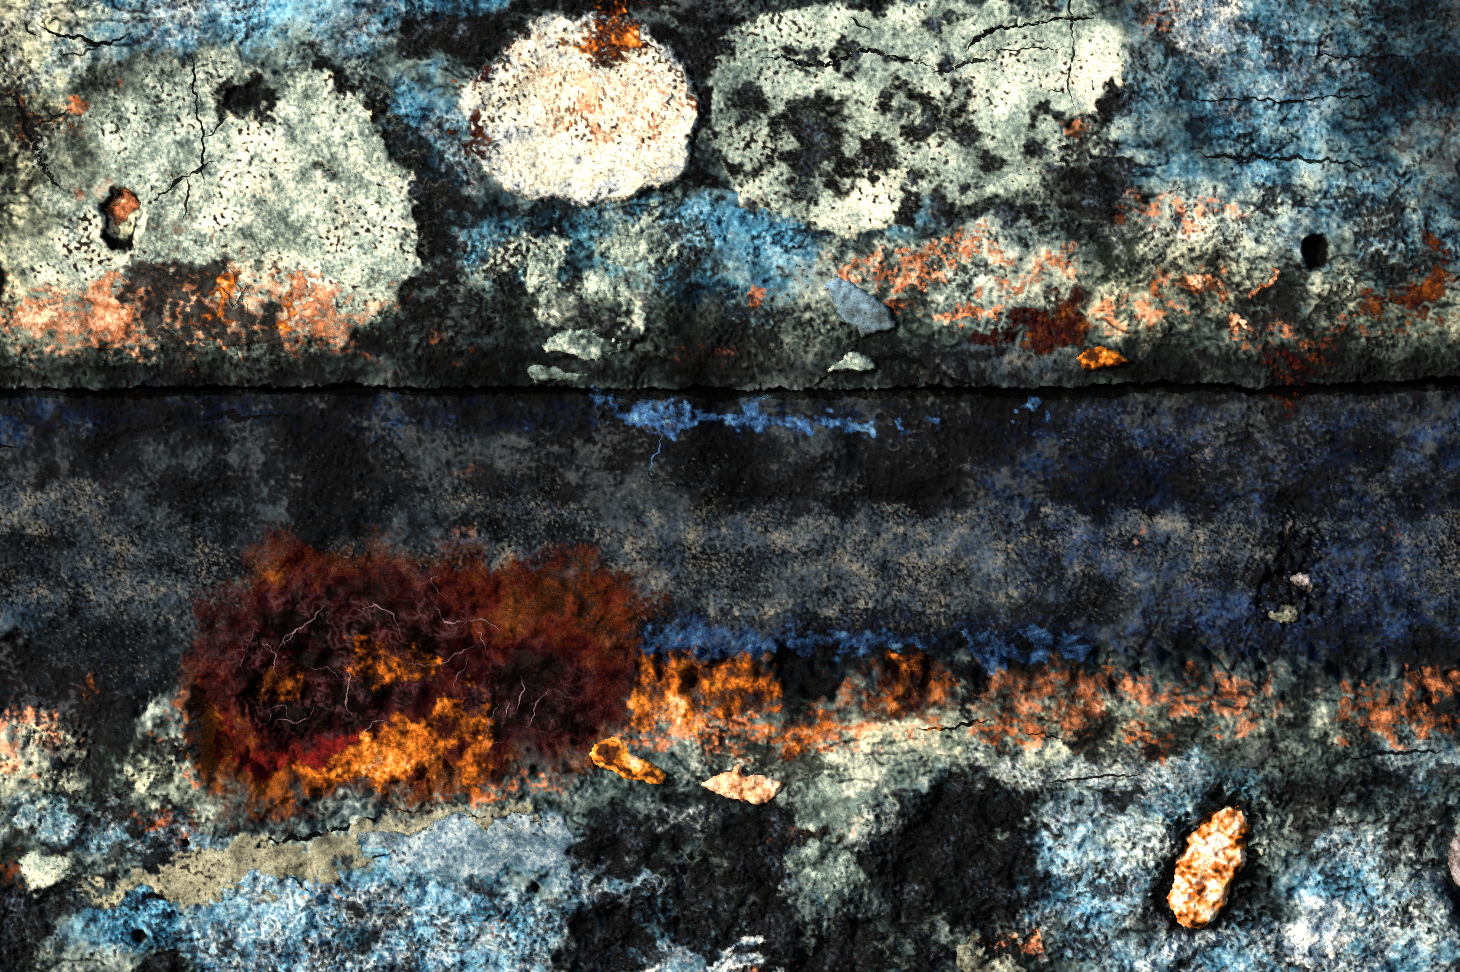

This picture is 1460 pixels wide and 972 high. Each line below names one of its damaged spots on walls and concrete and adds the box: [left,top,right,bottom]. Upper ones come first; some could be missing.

crack [6,90,73,189]
crack [124,52,227,218]
mould [209,71,280,131]
leakage [310,44,458,321]
corrosion [554,0,647,70]
leakage [381,0,1159,231]
crack [757,0,1098,110]
corrosion [0,261,382,361]
corrosion [824,219,1097,355]
corrosion [178,536,1094,821]
corrosion [1331,664,1460,744]
peeling [19,793,581,909]